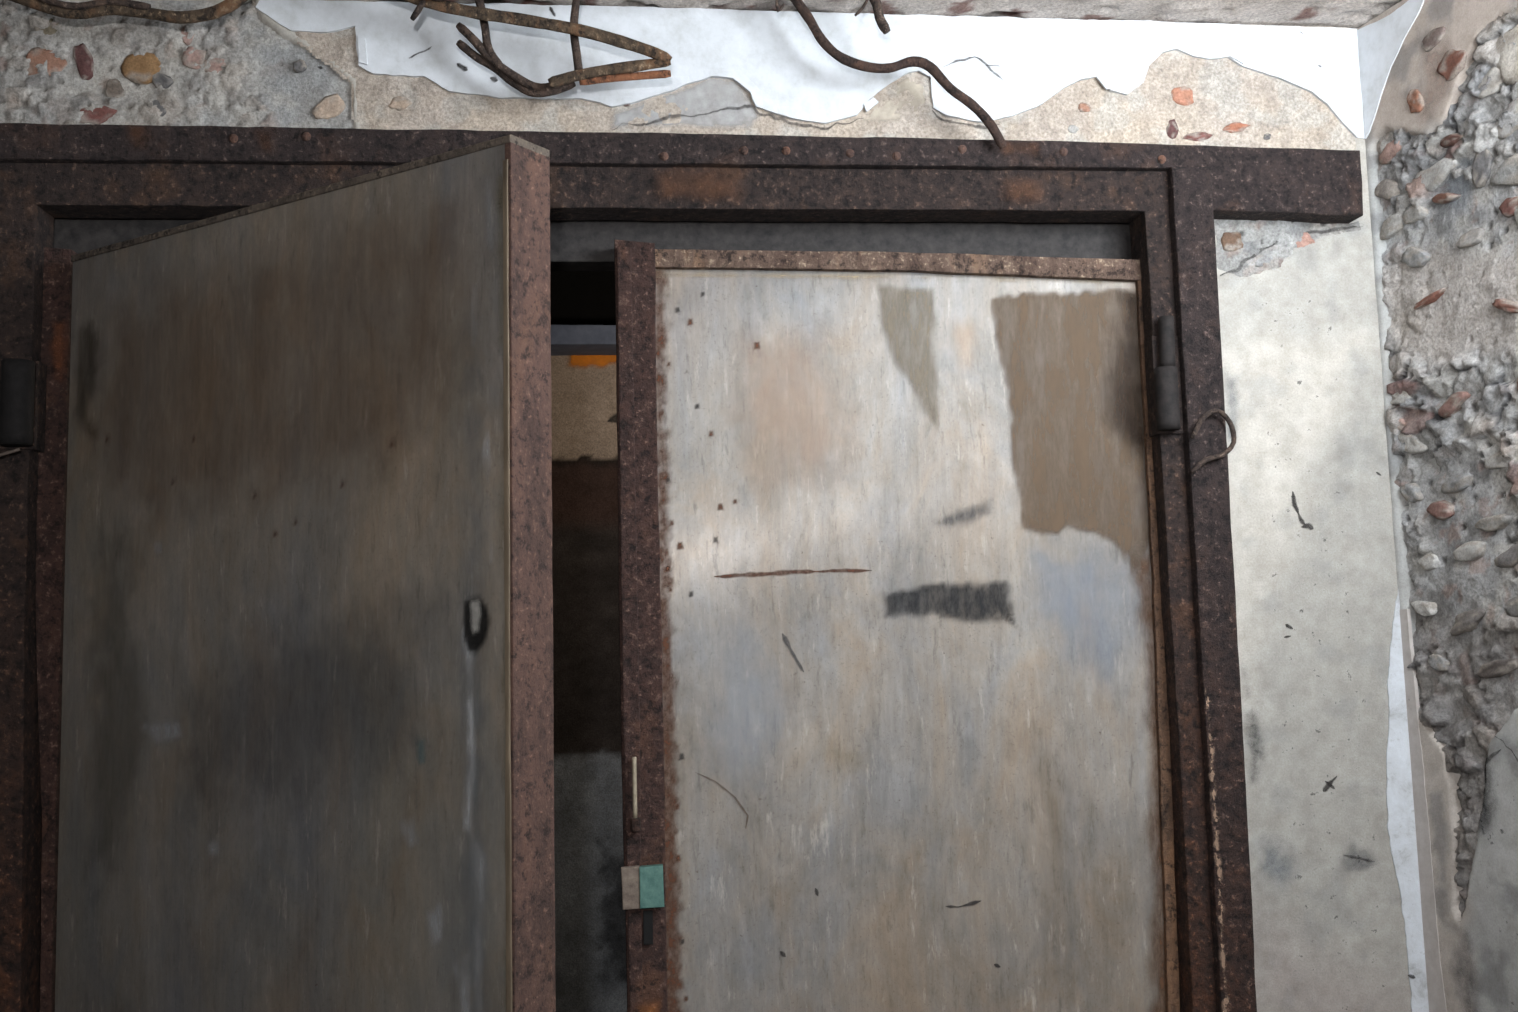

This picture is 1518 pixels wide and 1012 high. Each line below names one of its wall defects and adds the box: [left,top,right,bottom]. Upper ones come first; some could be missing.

peeling [0,0,1424,150]
spalling [1214,219,1361,277]
corrosion [571,355,616,366]
spalling [1292,491,1314,530]
spalling [1374,3,1518,1012]
corrosion [647,270,693,1012]
corrosion [1137,558,1166,1012]
crack [1485,733,1516,765]